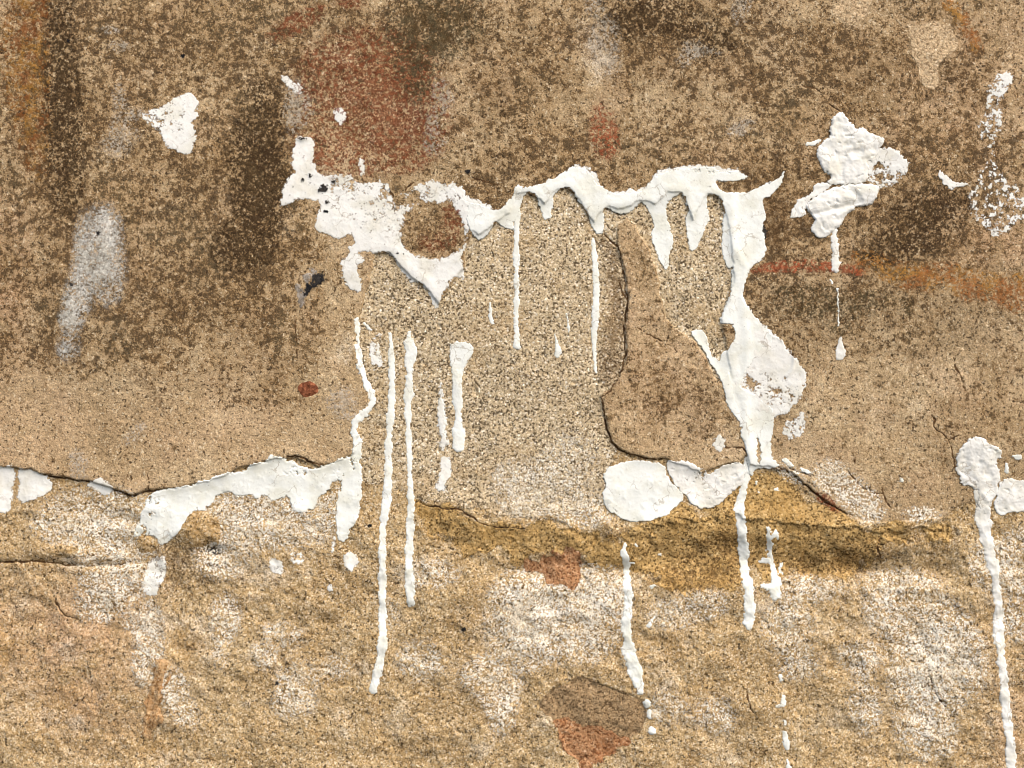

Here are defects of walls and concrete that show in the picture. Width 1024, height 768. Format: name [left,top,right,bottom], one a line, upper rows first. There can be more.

rust [300,30,447,173]
rust [751,250,1024,313]
rust [298,381,318,397]
spalling [133,112,955,630]
crack [601,234,678,460]
crack [40,473,160,497]
crack [287,455,322,466]
crack [415,501,525,529]